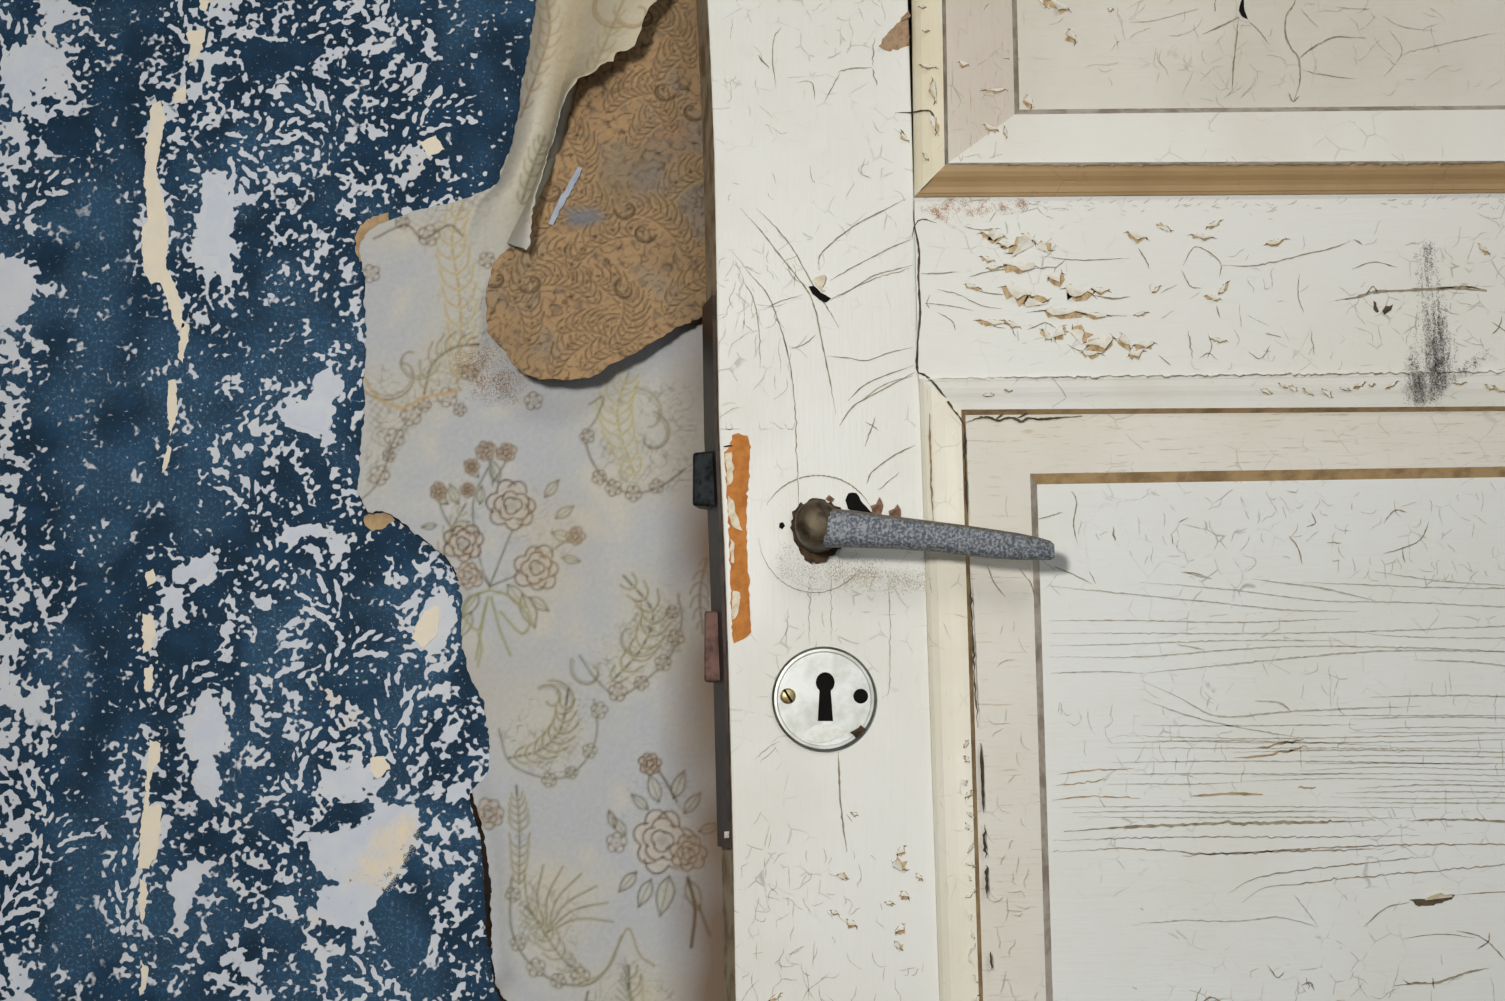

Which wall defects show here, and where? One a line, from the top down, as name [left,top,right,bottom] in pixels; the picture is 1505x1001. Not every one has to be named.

peeling [186,29,206,63]
peeling [420,135,444,157]
peeling [141,84,189,363]
peeling [963,228,1157,360]
crack [718,0,1505,509]
peeling [162,379,178,473]
peeling [142,614,156,692]
peeling [170,553,214,616]
crack [760,548,891,697]
peeling [190,706,225,793]
crack [984,490,1505,1001]
peeling [138,739,162,923]